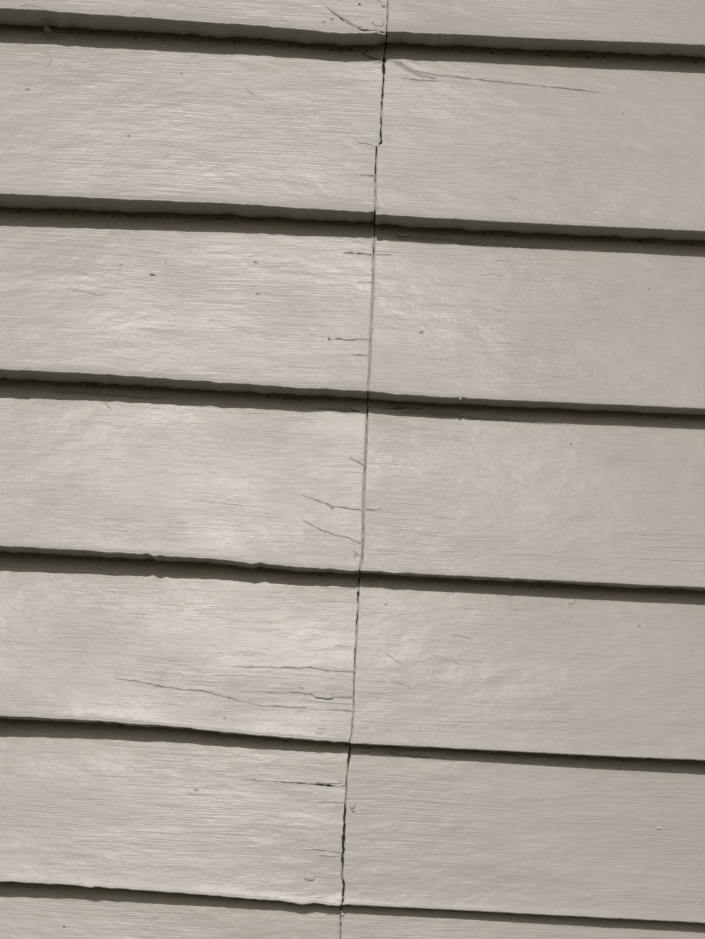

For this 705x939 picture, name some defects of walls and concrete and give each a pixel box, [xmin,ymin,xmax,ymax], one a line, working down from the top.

crack [116,0,601,939]